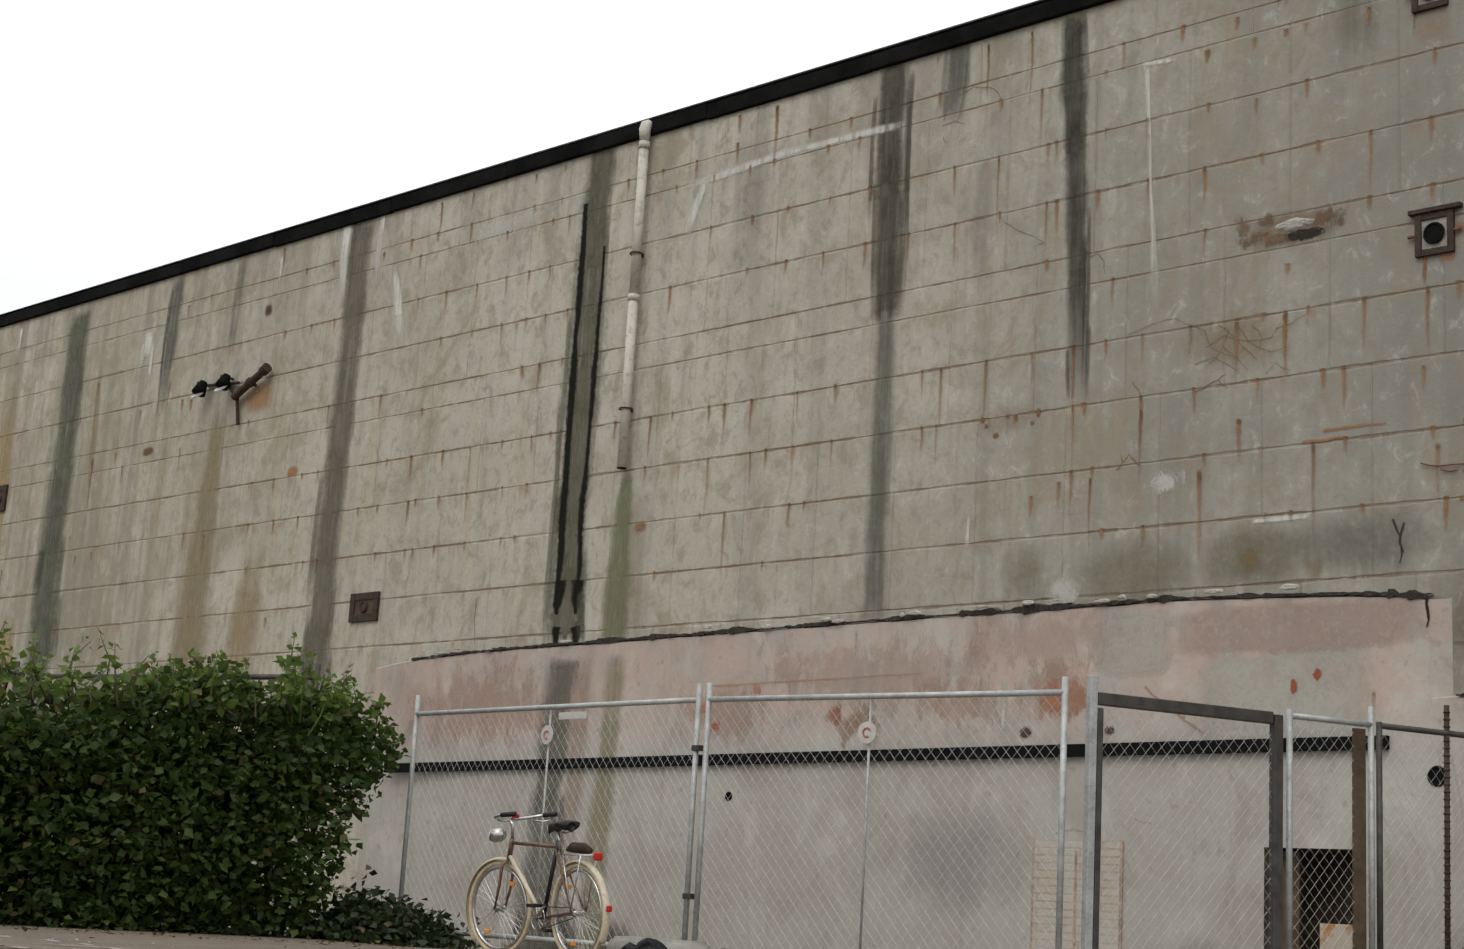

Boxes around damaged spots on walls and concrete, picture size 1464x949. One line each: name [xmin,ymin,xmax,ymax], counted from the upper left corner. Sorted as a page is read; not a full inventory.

damp [27,314,88,710]
damp [303,215,386,690]
damp [393,272,402,334]
damp [516,148,621,949]
damp [689,64,913,594]
damp [1063,18,1090,382]
rust [1197,453,1206,510]
spalling [1239,207,1344,247]
rust [1302,423,1386,473]
rust [1420,426,1464,472]